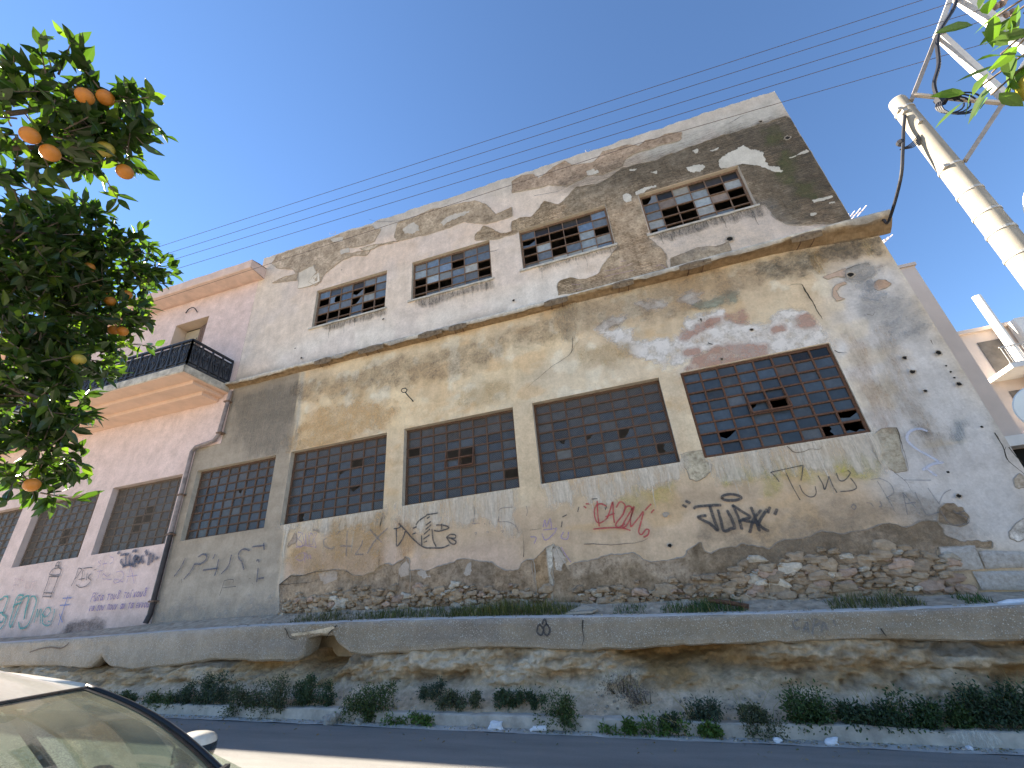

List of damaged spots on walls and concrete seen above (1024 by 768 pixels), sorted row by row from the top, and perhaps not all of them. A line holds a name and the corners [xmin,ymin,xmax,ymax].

flaking render [272,116,851,310]
peeling [823,268,856,301]
flaking render [279,493,994,614]